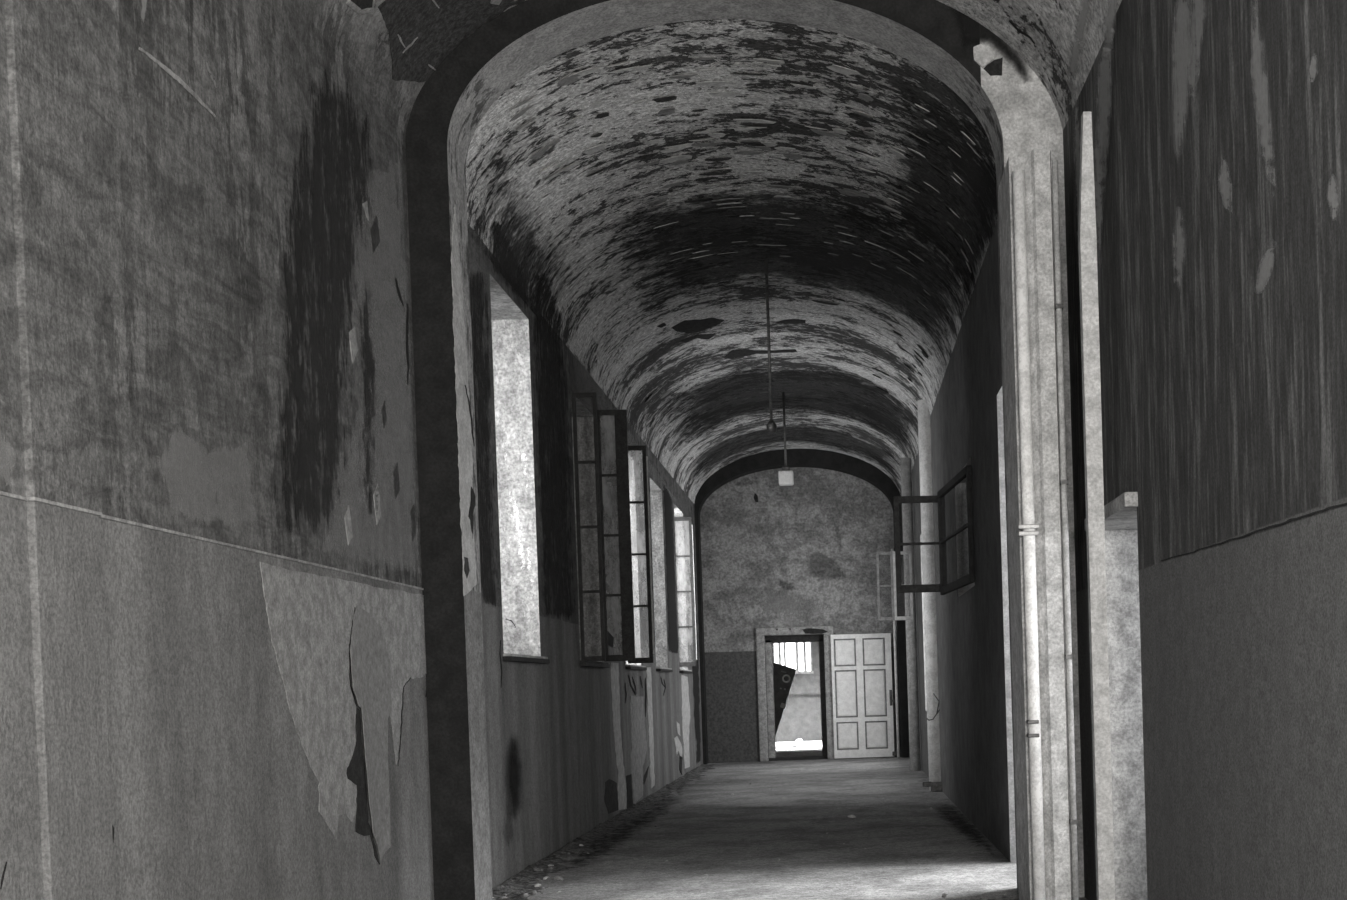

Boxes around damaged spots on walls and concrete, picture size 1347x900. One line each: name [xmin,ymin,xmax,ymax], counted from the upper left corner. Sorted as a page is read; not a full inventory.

peeling [346,0,525,83]
leakage [275,69,377,532]
peeling [260,562,427,865]